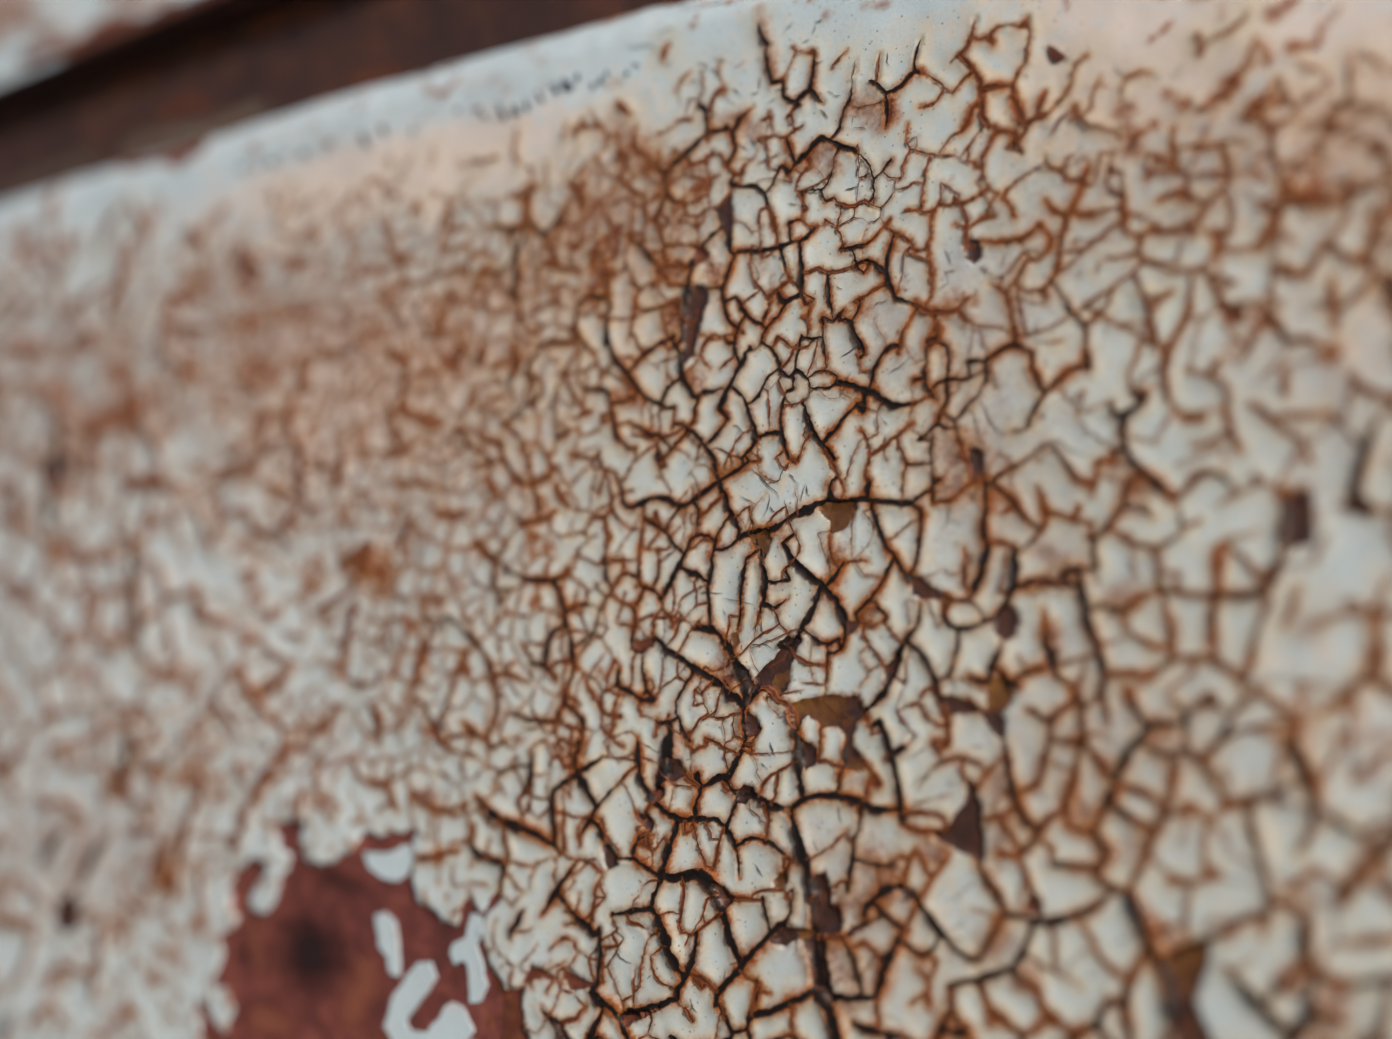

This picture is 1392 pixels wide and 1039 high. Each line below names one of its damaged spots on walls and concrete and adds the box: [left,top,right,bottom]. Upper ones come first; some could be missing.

rust [1267,0,1296,20]
rust [1287,13,1334,50]
rust [0,0,686,205]
crack [131,410,274,495]
crack [126,525,145,665]
crack [259,659,289,696]
crack [111,730,132,797]
crack [240,754,287,816]
crack [39,823,176,900]
peeling [195,820,594,1039]